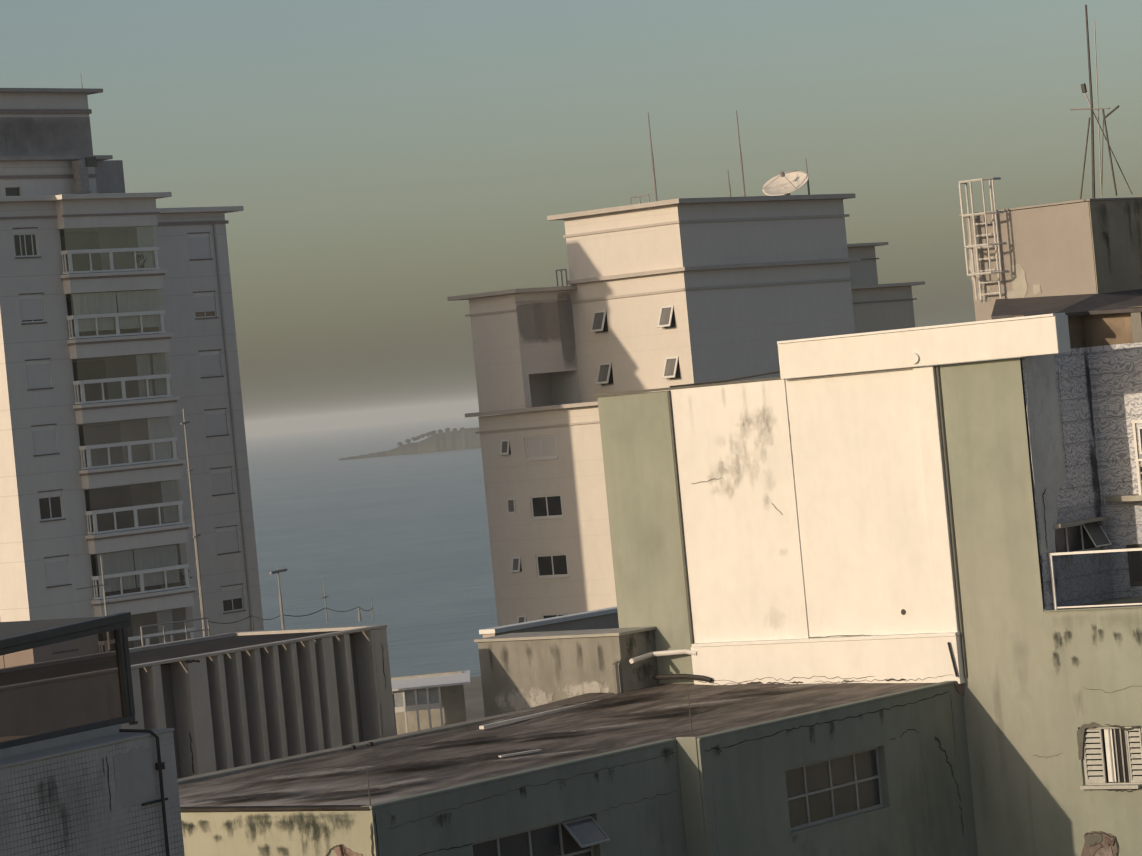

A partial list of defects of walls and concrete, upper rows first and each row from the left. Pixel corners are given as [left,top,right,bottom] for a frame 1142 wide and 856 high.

leakage [517,294,575,362]
leakage [183,681,845,804]
crack [698,675,964,836]
leakage [282,814,347,840]
spalling [326,844,363,856]
crack [370,752,678,856]
spalling [1081,831,1118,856]